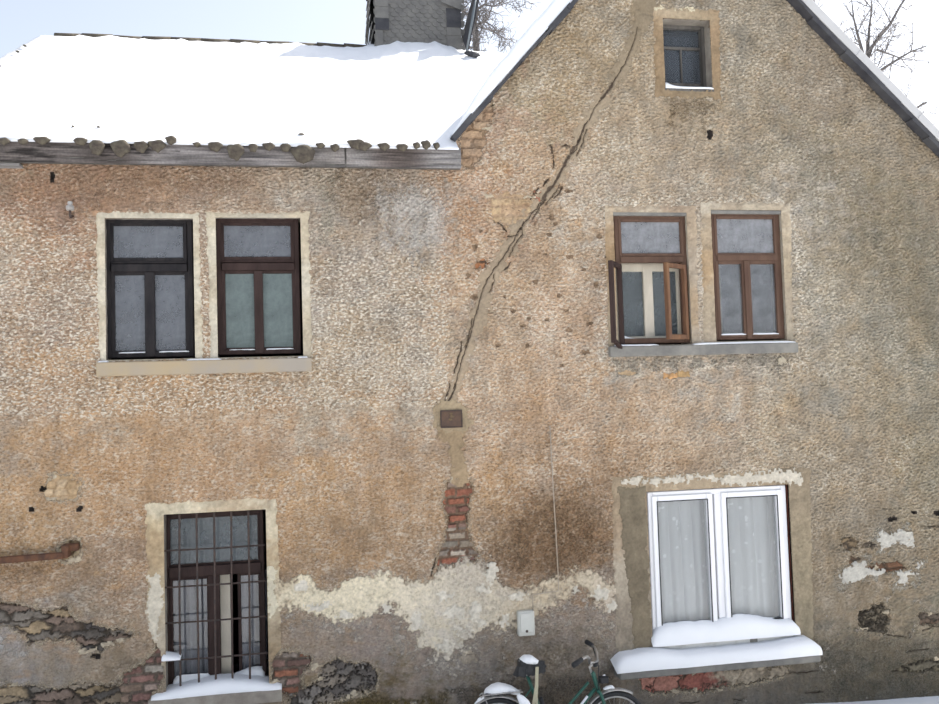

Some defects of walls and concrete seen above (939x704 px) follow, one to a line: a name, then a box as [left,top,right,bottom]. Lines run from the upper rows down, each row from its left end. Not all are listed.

crack [440,0,661,401]
peeling [621,467,803,487]
leakage [497,501,608,572]
flaking render [267,477,618,677]
flaking render [837,522,928,632]
flaking render [0,570,167,704]
flaking render [913,611,939,632]
flaking render [269,649,379,704]
flaking render [638,666,789,697]